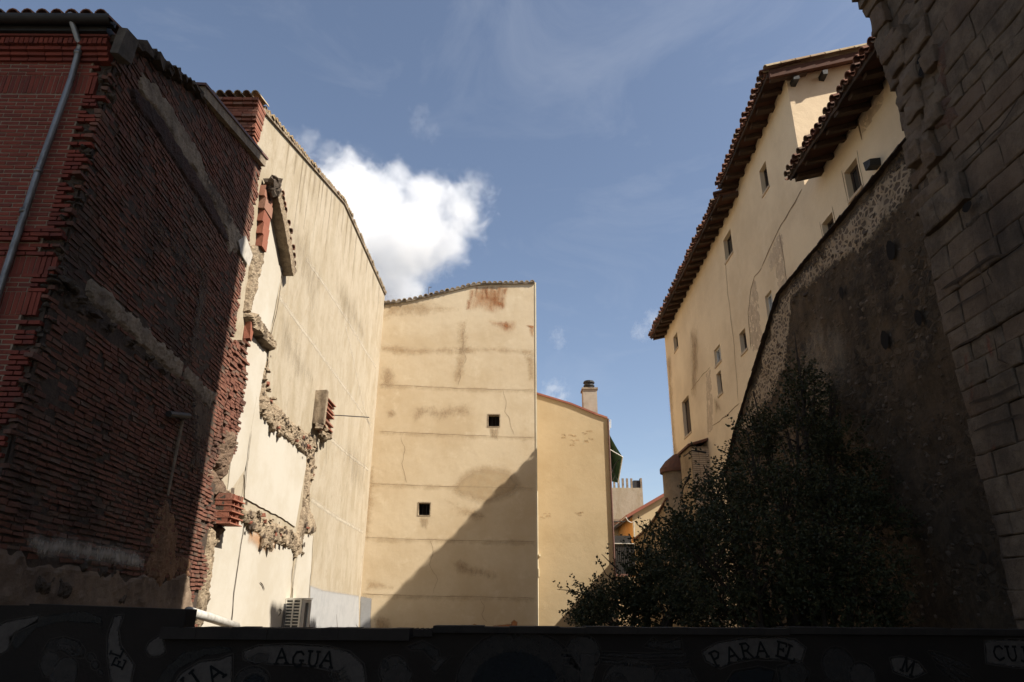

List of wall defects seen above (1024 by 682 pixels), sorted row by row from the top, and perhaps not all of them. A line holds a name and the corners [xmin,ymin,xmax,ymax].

spalling [280,187,296,266]
crack [714,189,802,425]
spalling [207,430,238,496]
spalling [239,358,333,559]
crack [372,332,522,488]
peeling [31,537,142,565]